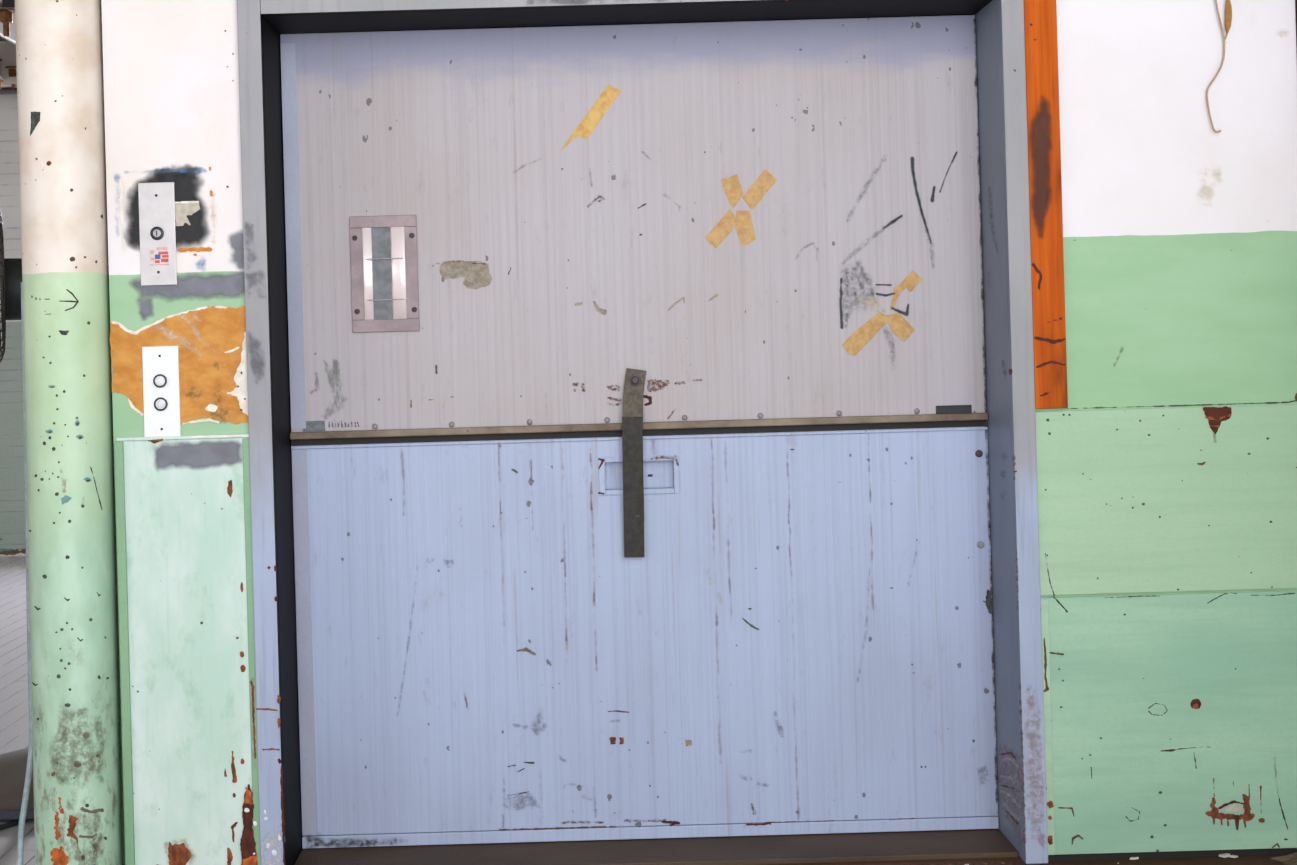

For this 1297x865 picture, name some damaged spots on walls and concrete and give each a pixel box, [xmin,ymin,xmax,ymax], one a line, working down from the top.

peeling [110,305,249,438]
peeling [1136,393,1297,436]
rust [50,797,80,865]
rust [157,842,192,865]
rust [224,681,280,865]
rust [1205,778,1265,830]